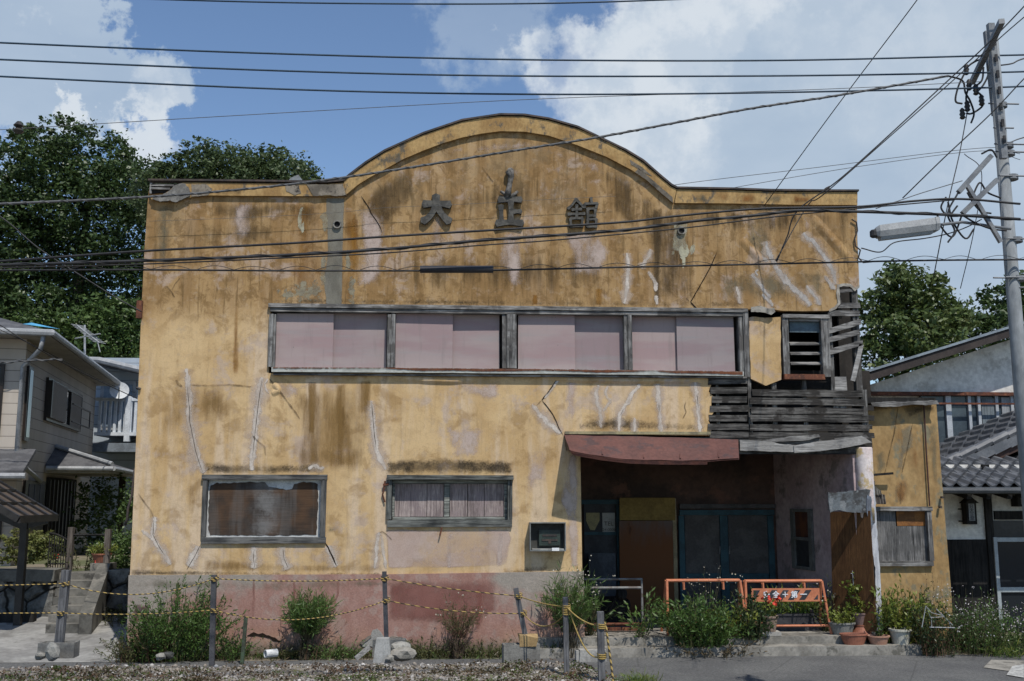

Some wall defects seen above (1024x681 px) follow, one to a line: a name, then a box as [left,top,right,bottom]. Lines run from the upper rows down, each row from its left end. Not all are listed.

spalling [149,183,212,203]
damp [648,212,680,294]
peeling [673,225,695,268]
crack [688,253,717,308]
damp [271,383,353,473]
damp [361,383,369,410]
crack [532,381,563,434]
damp [388,461,442,472]
damp [454,460,510,473]